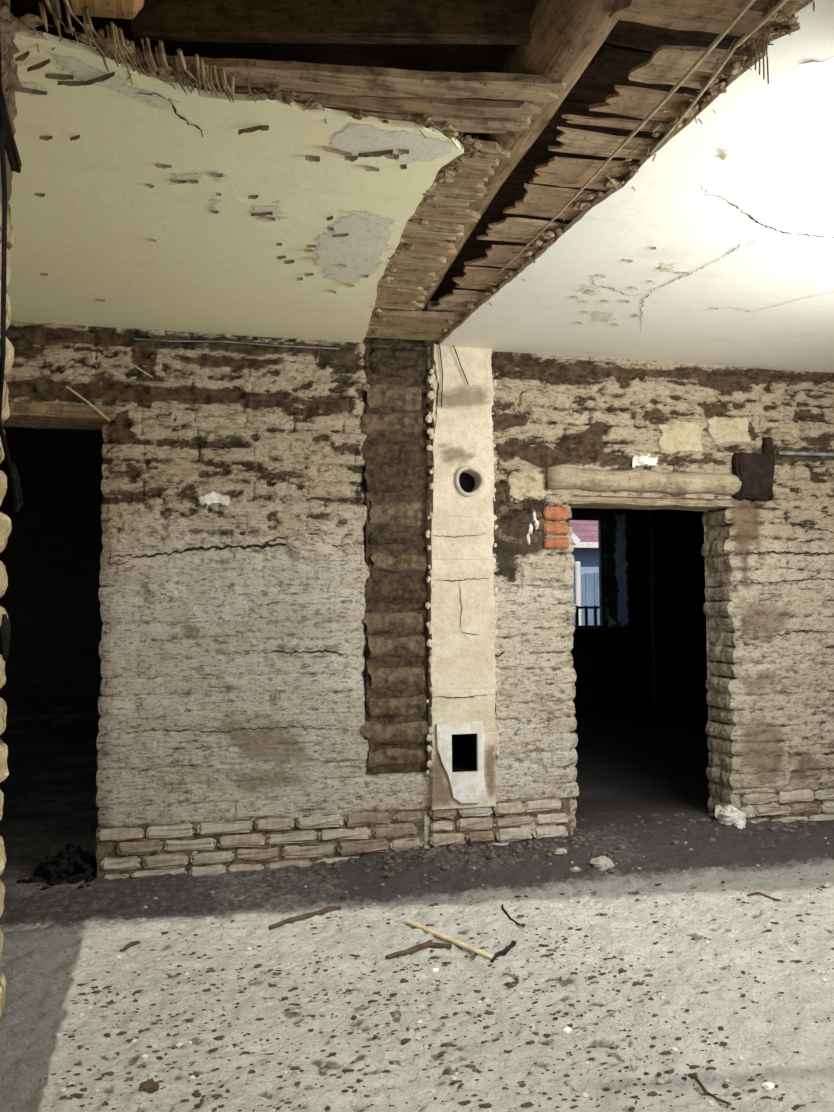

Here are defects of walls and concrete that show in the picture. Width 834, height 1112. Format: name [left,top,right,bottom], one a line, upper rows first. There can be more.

peeling [0,0,180,135]
crack [135,92,203,137]
peeling [156,164,226,214]
peeling [238,125,269,135]
peeling [248,195,287,222]
peeling [305,123,459,172]
peeling [276,210,397,294]
crack [592,186,834,330]
spalling [491,354,834,545]
crack [107,536,296,565]
spalling [0,324,429,774]
peeling [603,514,629,627]